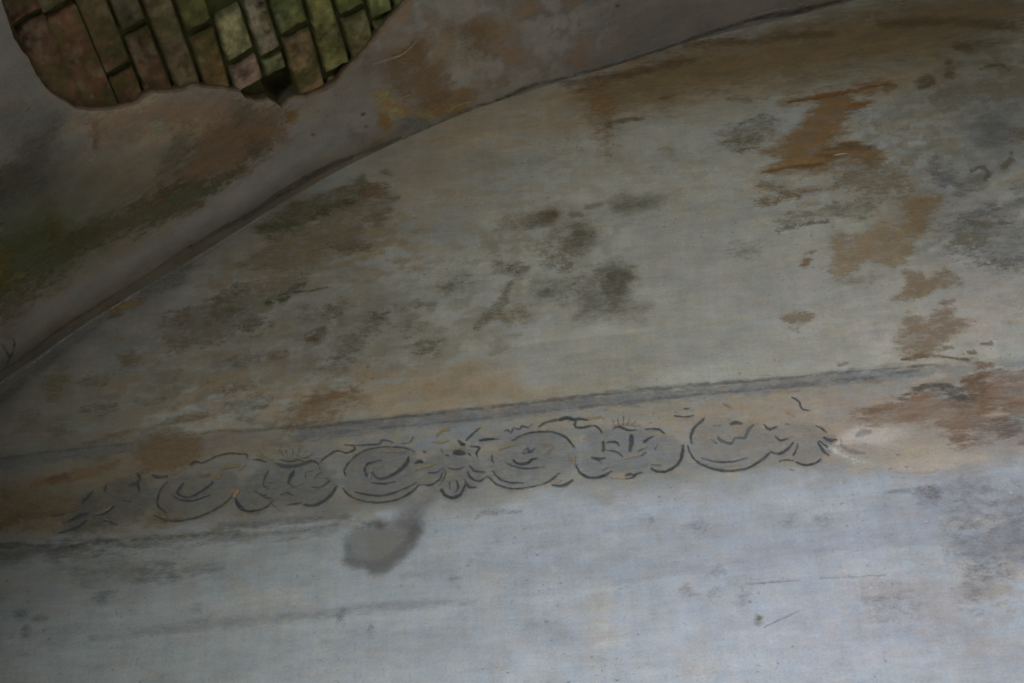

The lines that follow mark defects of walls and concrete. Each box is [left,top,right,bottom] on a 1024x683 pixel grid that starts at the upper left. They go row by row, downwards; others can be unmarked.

spalling [2,0,407,111]